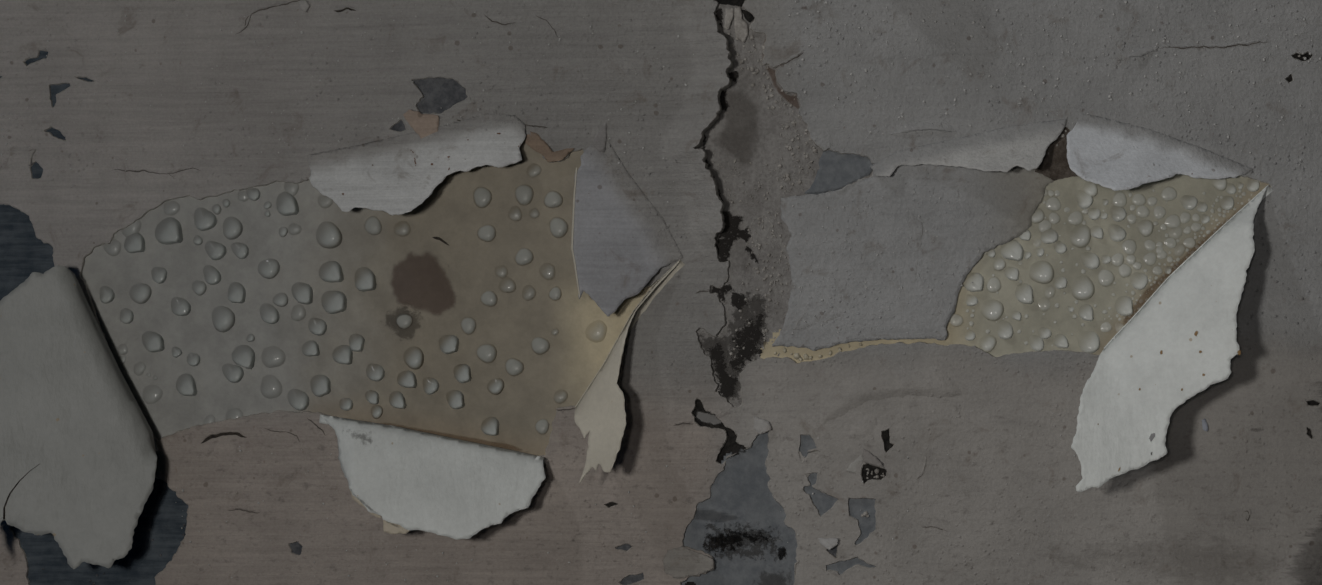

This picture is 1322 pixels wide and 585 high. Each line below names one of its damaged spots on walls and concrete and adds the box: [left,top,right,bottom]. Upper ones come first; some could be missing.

peeling [25,51,48,65]
peeling [31,162,43,178]
peeling [46,128,66,140]
peeling [50,78,93,107]
peeling [0,204,188,585]
peeling [319,415,546,540]
peeling [307,78,685,484]
peeling [662,416,797,585]
crack [673,0,873,463]
peeling [804,429,894,575]
peeling [772,113,1253,351]
peeling [1071,185,1273,492]